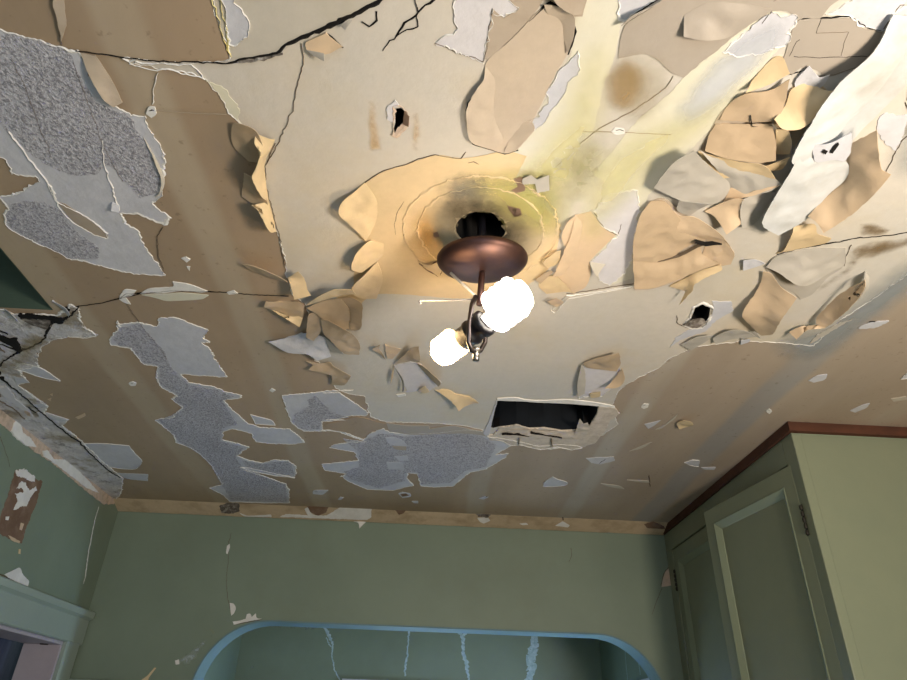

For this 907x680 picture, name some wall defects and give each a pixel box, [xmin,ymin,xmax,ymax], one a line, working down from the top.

crack [383,0,435,50]
crack [76,0,382,162]
crack [72,227,283,354]
peeling [0,0,907,529]
crack [777,226,907,266]
flaking render [0,468,43,554]
crack [323,628,340,680]
crack [403,631,411,676]
crack [458,633,470,680]
crack [524,636,539,680]